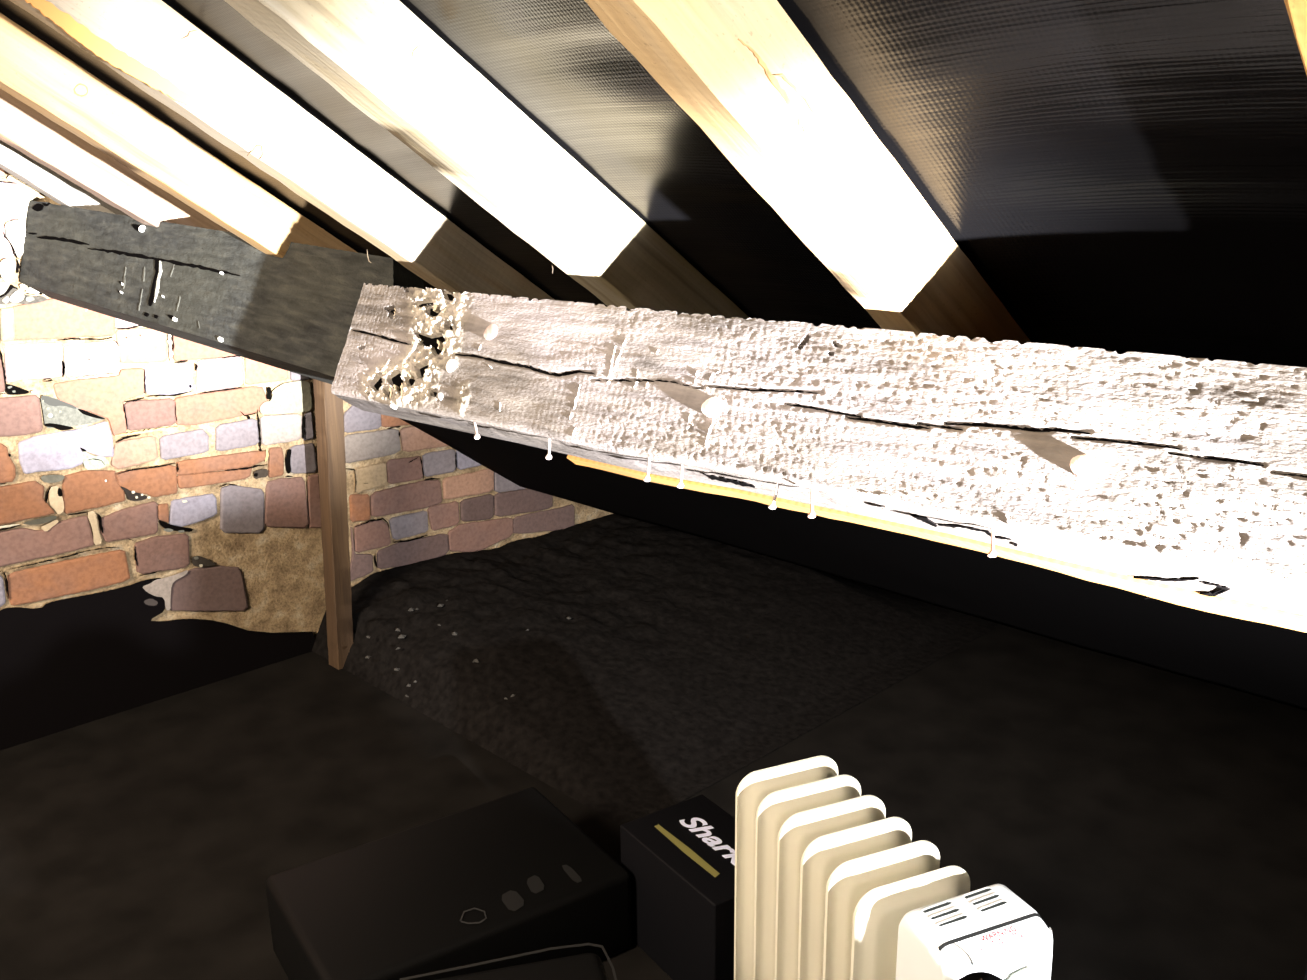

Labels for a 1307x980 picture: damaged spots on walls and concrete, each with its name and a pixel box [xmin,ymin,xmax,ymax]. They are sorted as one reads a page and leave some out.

crack [455,354,1307,478]
crack [703,473,755,488]
crack [910,513,1011,540]
crack [1133,576,1230,599]